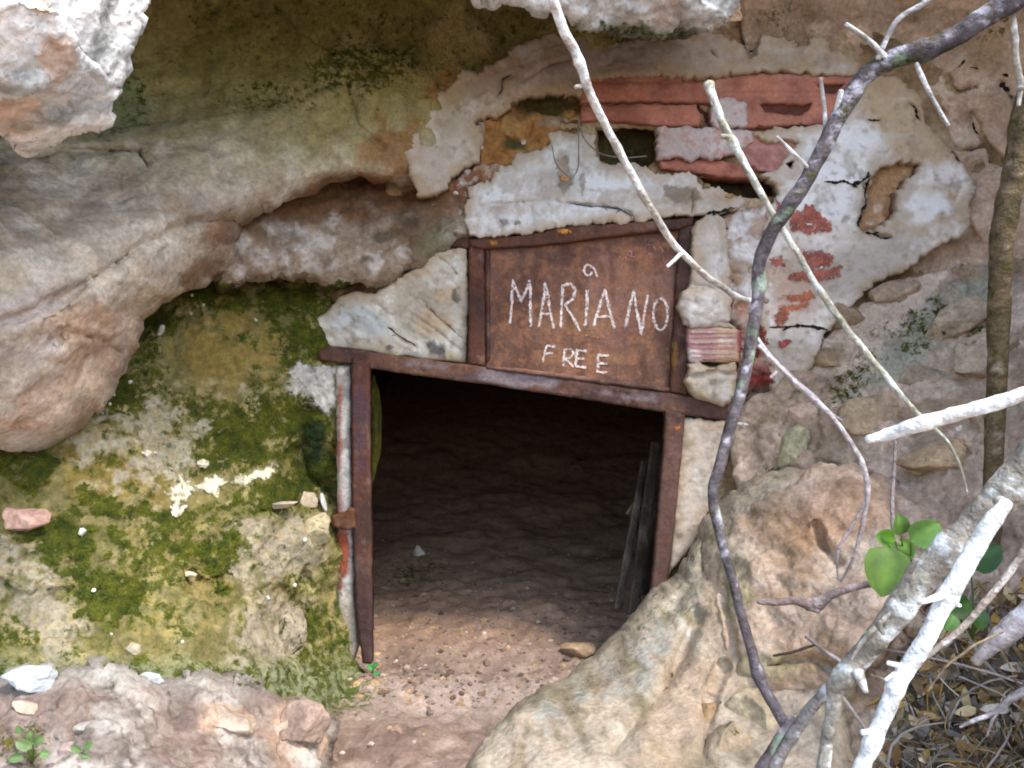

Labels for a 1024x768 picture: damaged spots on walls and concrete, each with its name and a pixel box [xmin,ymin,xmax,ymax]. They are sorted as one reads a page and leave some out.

spalling [598,130,656,167]
peeling [789,203,832,236]
crack [824,172,892,239]
spalling [859,163,914,232]
flaking render [685,327,742,363]
peeling [748,249,843,387]
crack [769,323,828,331]
rust [337,534,349,596]